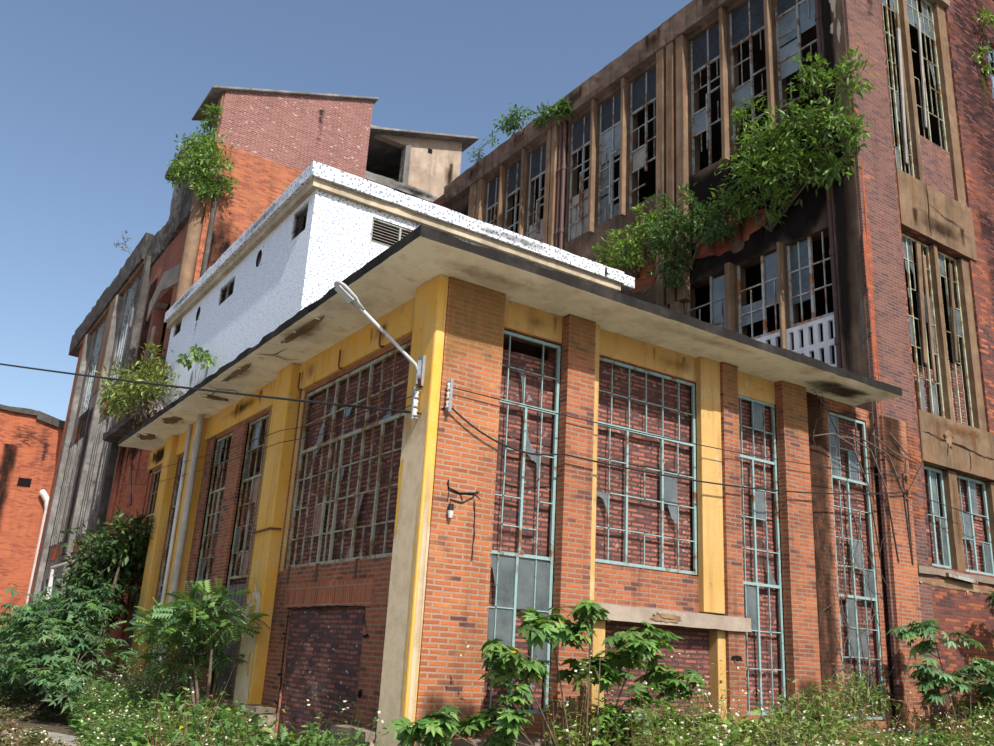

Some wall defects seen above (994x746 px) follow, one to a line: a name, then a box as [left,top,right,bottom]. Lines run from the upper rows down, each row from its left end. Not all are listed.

peeling [829,0,841,42]
leakage [949,0,994,194]
leakage [206,227,230,271]
leakage [930,222,964,240]
peeling [232,574,261,708]